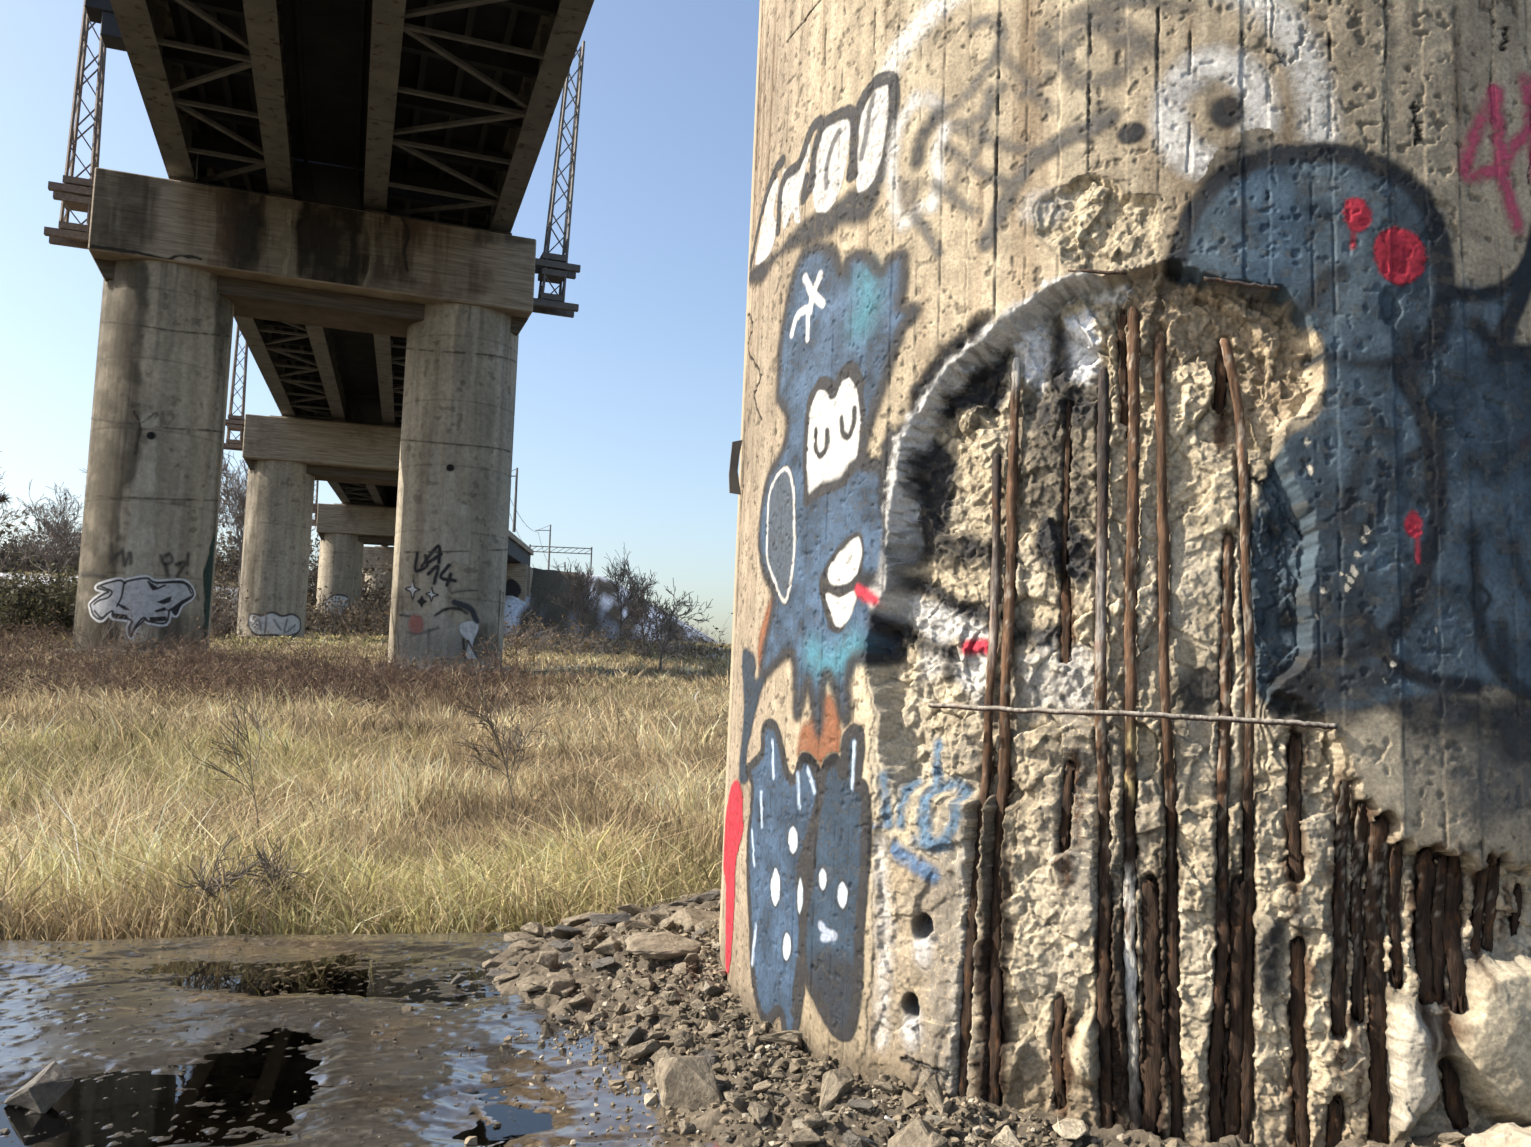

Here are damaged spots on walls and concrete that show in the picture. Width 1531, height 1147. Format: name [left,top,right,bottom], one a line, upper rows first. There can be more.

damp [221,191,415,286]
spalling [860,172,1531,1147]